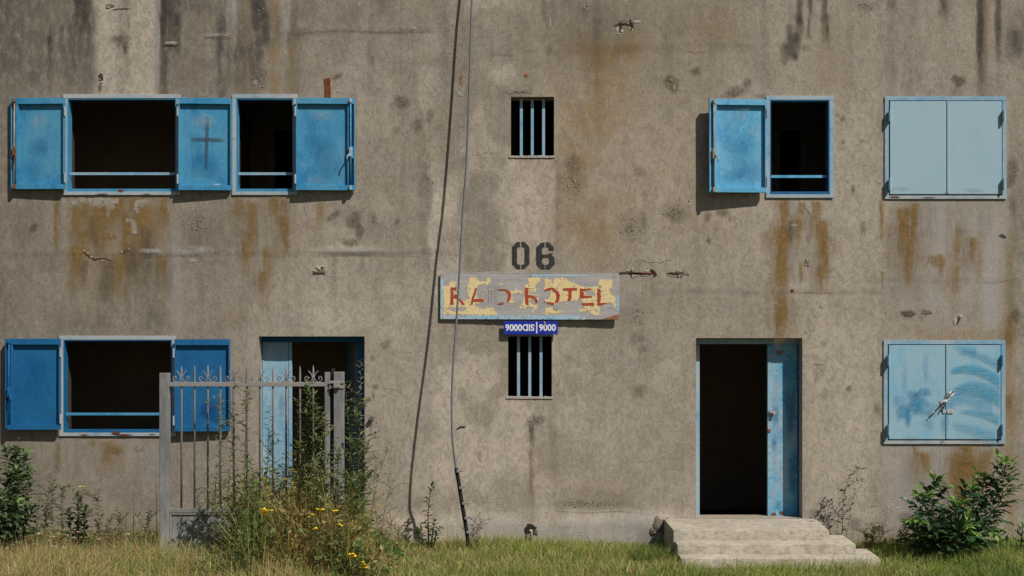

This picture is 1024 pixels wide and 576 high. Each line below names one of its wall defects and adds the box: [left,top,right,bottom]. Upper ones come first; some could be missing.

corrosion [777,201,801,325]